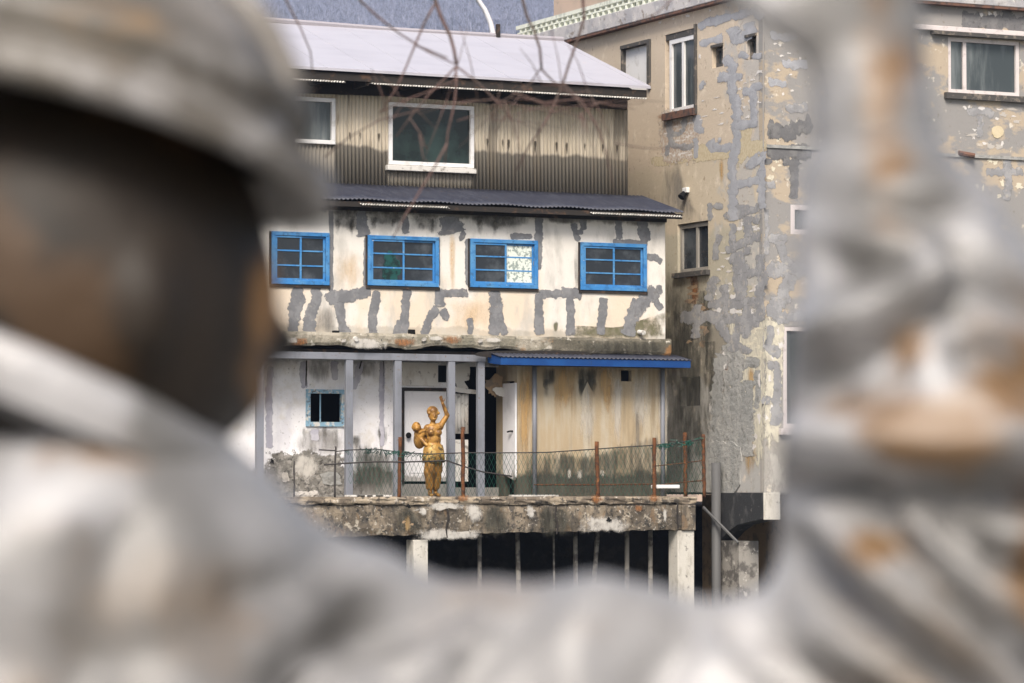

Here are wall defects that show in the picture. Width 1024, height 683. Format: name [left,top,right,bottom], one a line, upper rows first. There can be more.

peeling [658,70,780,167]
peeling [963,105,1021,165]
water stain [579,370,595,392]
peeling [685,252,785,468]
spalling [265,449,358,497]
water stain [528,448,651,486]
water stain [398,507,418,531]